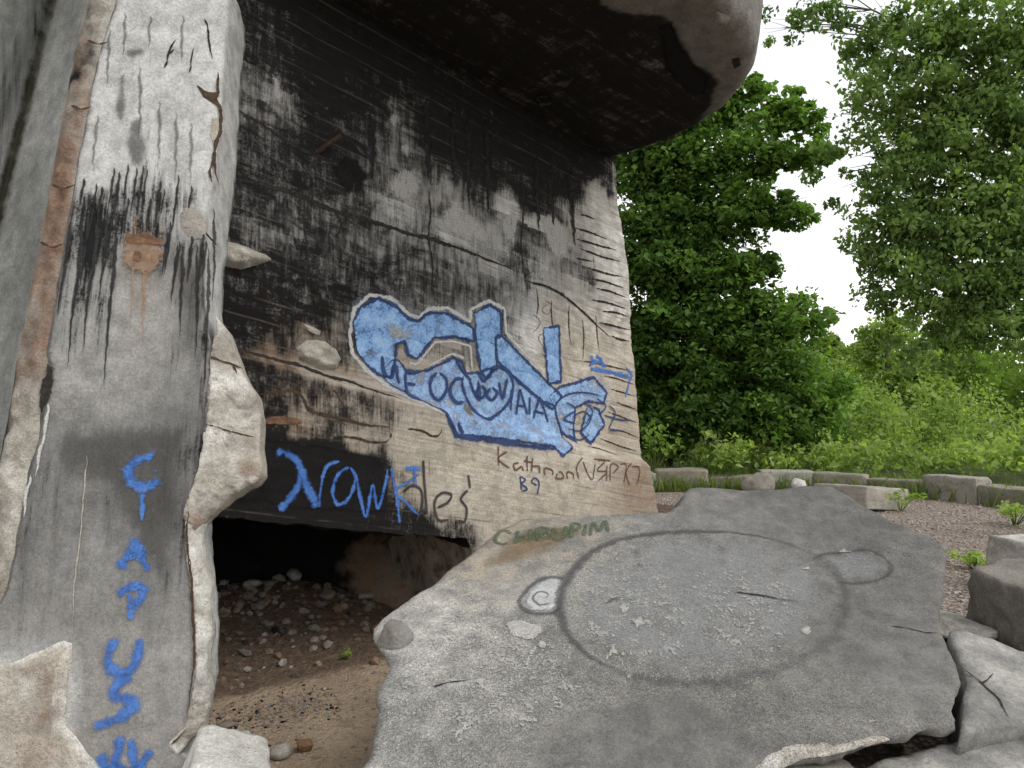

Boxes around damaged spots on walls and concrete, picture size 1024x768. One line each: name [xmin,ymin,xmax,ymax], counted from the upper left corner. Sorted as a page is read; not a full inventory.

water stain [57,74,217,385]
rust [122,213,164,337]
water stain [366,108,377,179]
crack [164,19,639,455]
water stain [389,99,432,200]
water stain [444,108,492,242]
water stain [502,214,518,241]
water stain [533,156,576,258]
crack [963,668,1009,717]